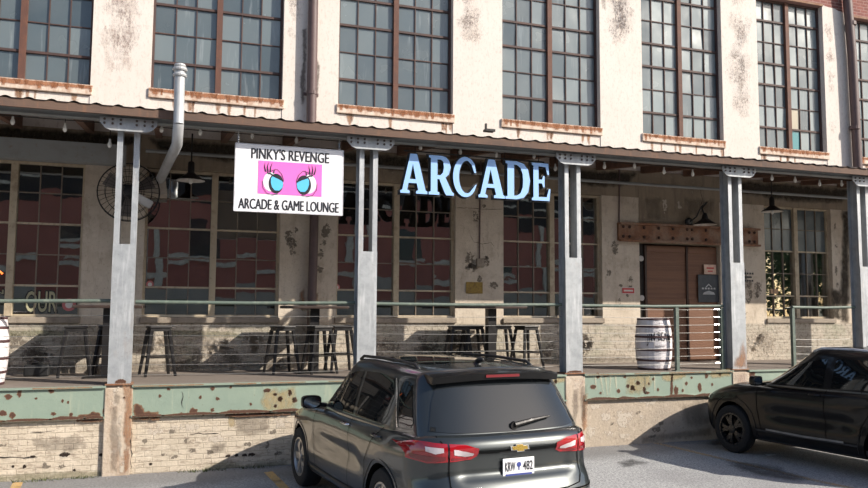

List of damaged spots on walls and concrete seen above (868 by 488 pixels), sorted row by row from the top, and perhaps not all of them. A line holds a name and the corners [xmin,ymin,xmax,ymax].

rust [0,78,93,101]
rust [185,91,283,115]
rust [503,119,603,142]
rust [645,134,726,156]
rust [761,147,829,161]
peeling [744,269,762,304]